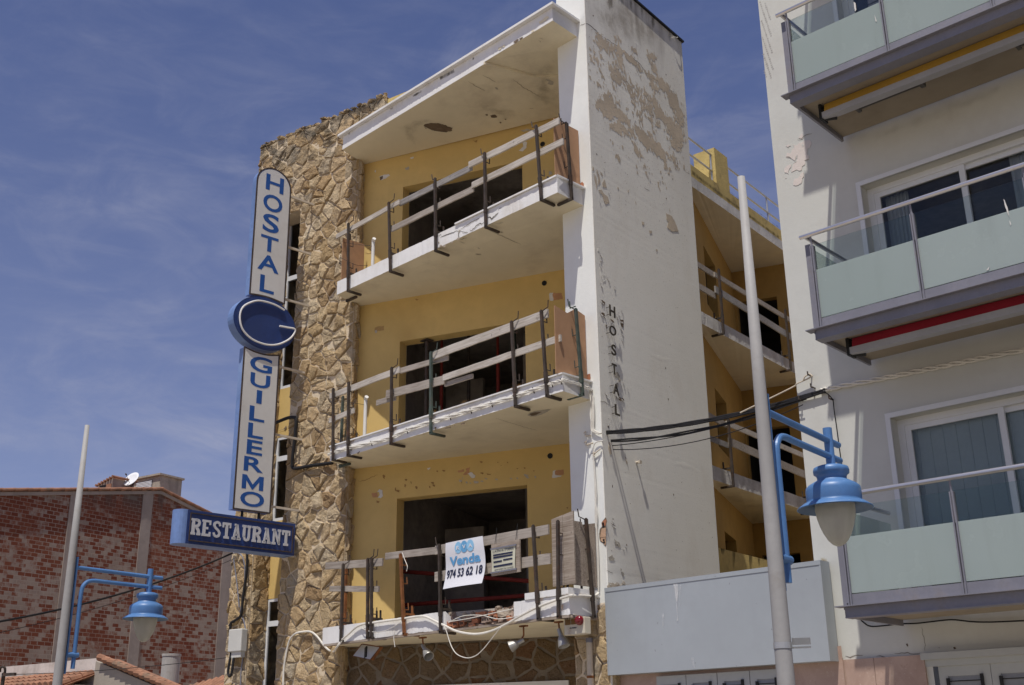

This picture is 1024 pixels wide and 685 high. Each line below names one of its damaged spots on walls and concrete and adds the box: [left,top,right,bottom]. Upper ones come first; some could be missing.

flaking render [424,123,452,133]
peeling [580,29,689,232]
peeling [784,133,812,186]